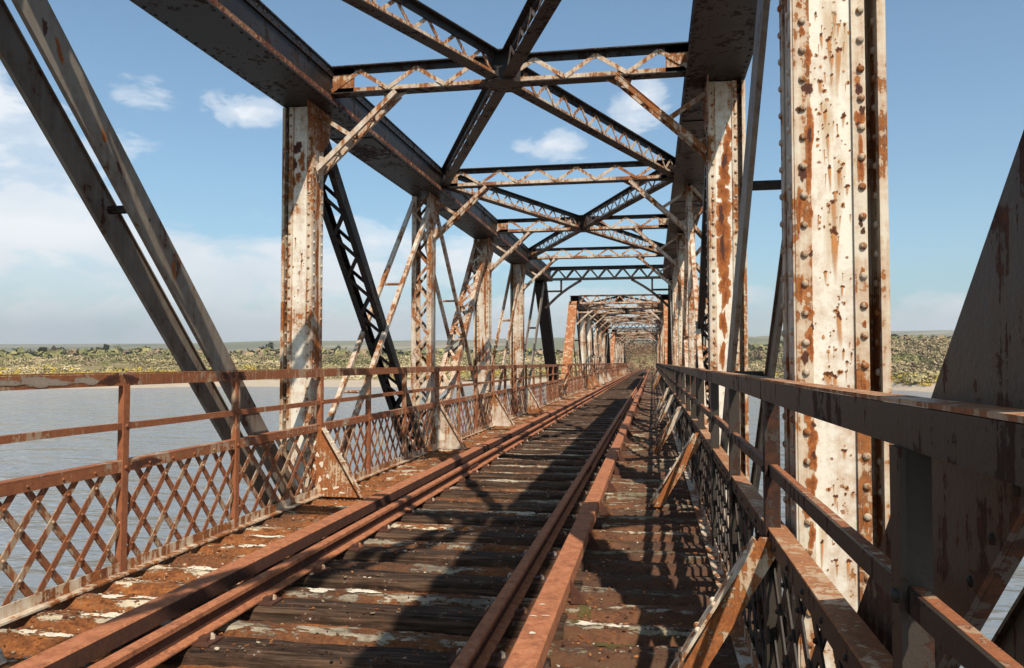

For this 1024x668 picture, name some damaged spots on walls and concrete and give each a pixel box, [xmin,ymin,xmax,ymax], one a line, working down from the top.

corrosion [293,142,305,188]
corrosion [796,7,868,390]
corrosion [293,172,320,367]
corrosion [719,281,731,370]
peeling [0,376,99,388]
corrosion [98,373,139,385]
corrosion [222,371,246,382]
corrosion [130,457,161,470]